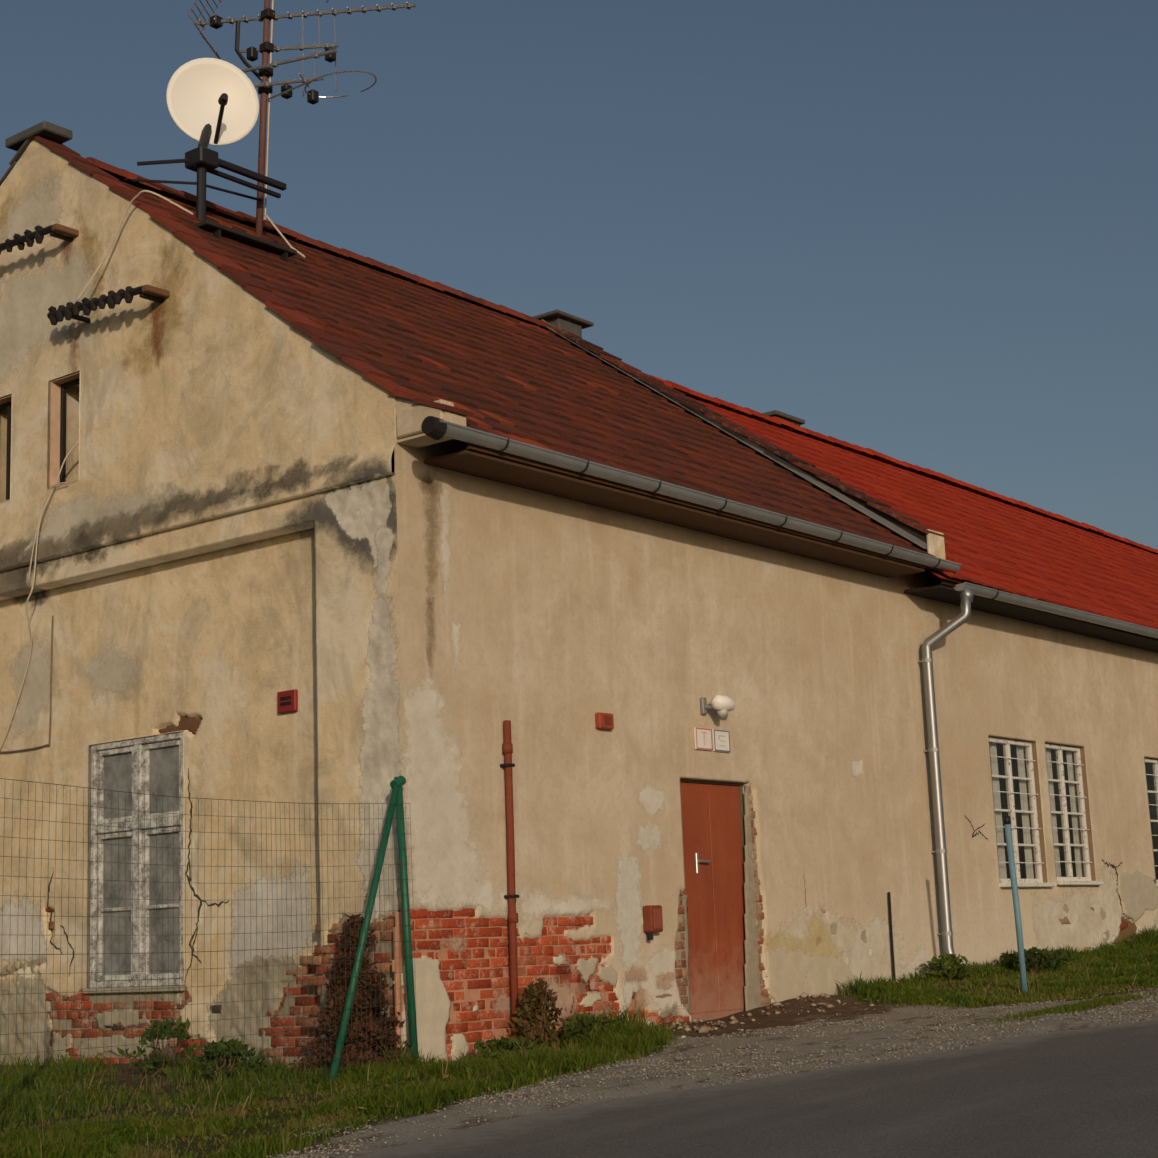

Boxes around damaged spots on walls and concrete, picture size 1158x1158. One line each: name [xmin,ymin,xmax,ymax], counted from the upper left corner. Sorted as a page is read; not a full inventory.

peeling [0,248,94,382]
damp [0,458,397,604]
damp [422,476,451,594]
crack [48,867,74,976]
crack [184,768,229,983]
spalling [0,474,691,1068]
damp [402,677,643,1019]
crack [964,815,989,841]
peeling [1033,867,1137,952]
crack [1102,859,1124,914]